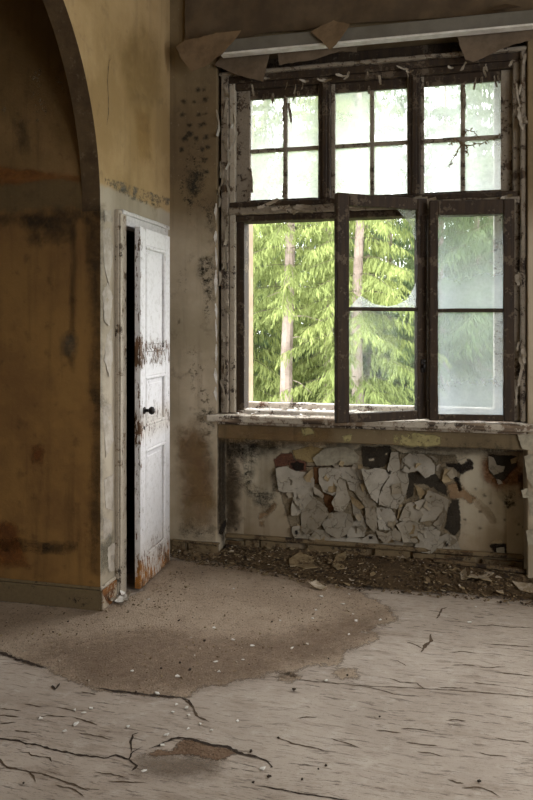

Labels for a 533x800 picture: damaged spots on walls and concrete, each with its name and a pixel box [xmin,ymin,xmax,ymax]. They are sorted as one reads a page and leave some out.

peeling [251,71,350,123]
peeling [463,64,500,109]
peeling [516,83,528,130]
peeling [257,149,313,215]
peeling [213,87,238,401]
peeling [515,342,527,405]
leakage [183,391,304,541]
peeling [274,432,476,570]
crack [182,698,209,722]
crack [0,704,145,797]
spalling [141,736,270,776]